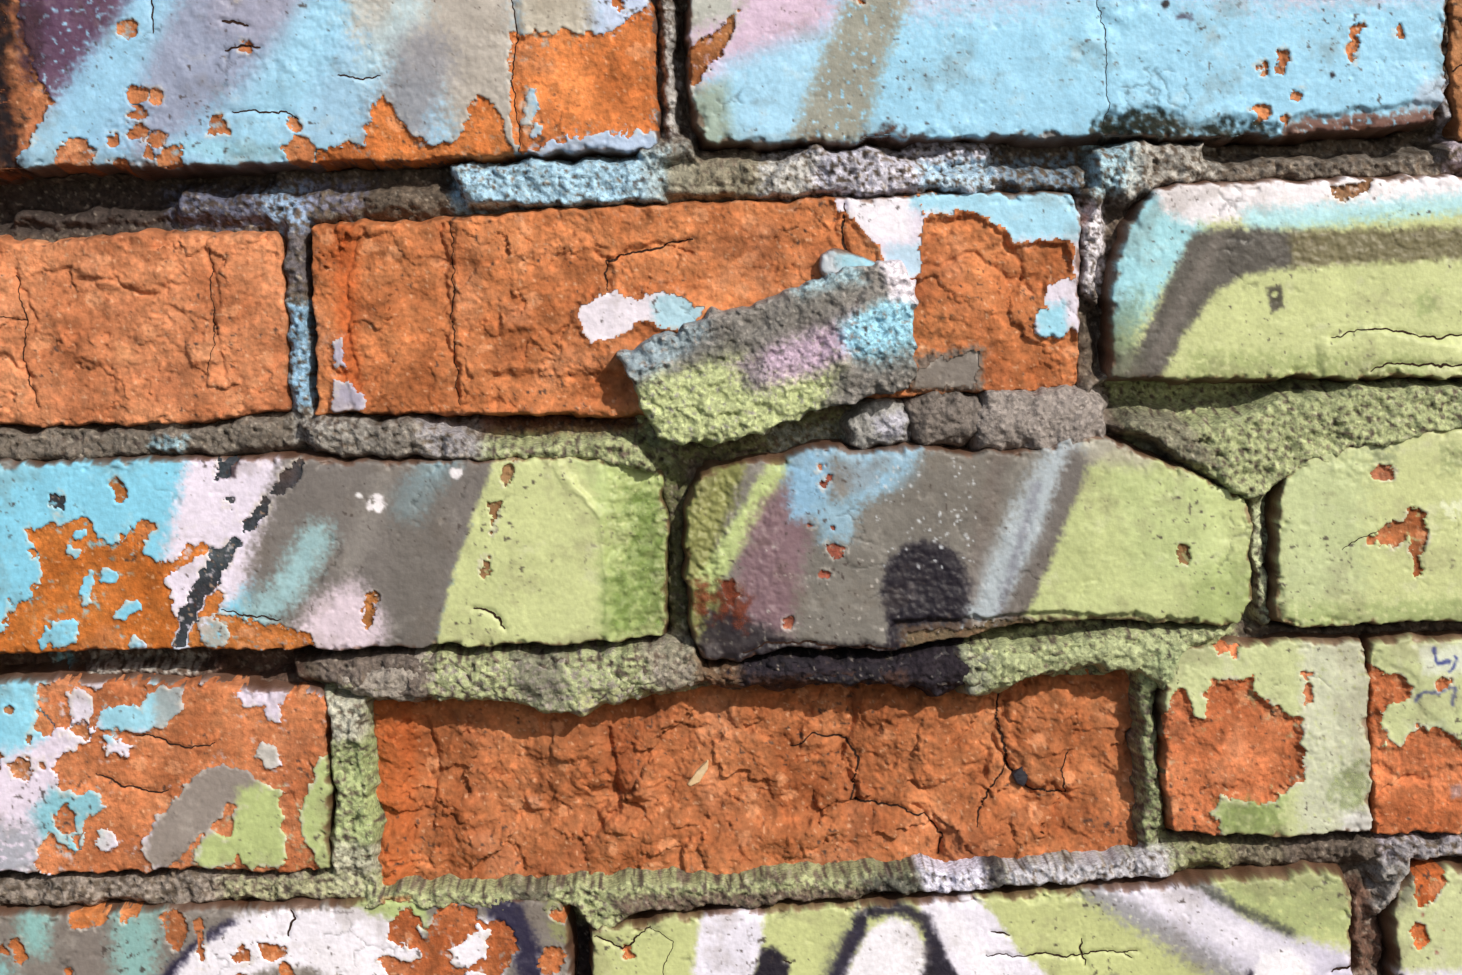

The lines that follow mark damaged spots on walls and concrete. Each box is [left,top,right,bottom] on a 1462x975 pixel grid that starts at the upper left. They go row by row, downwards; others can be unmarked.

peeling [55,85,184,178]
peeling [280,0,661,172]
spalling [0,228,293,428]
spalling [311,195,884,419]
spalling [865,191,1079,399]
crack [1331,328,1462,372]
peeling [0,455,314,654]
peeling [0,673,332,875]
crack [790,732,943,853]
crack [977,693,1069,827]
peeling [1156,671,1314,836]
spalling [1365,662,1462,835]